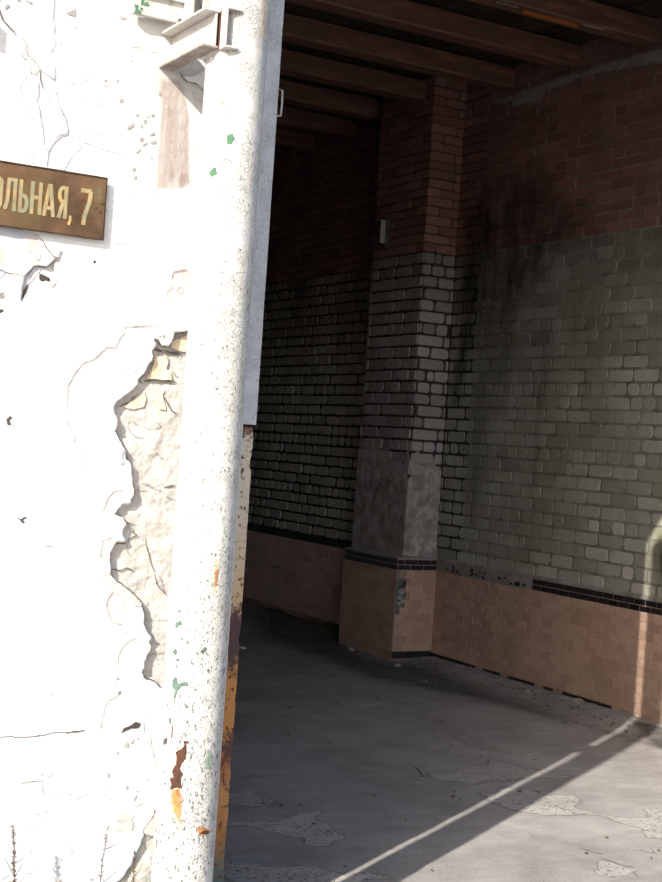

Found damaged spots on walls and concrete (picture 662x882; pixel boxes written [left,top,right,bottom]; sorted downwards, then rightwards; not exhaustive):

peeling [20,0,217,192]
peeling [0,226,41,261]
crack [0,238,58,278]
peeling [39,262,60,288]
flaking render [66,269,192,771]
peeling [437,560,533,591]
crack [0,730,92,829]
rust [170,741,189,820]
flaking render [103,774,155,882]